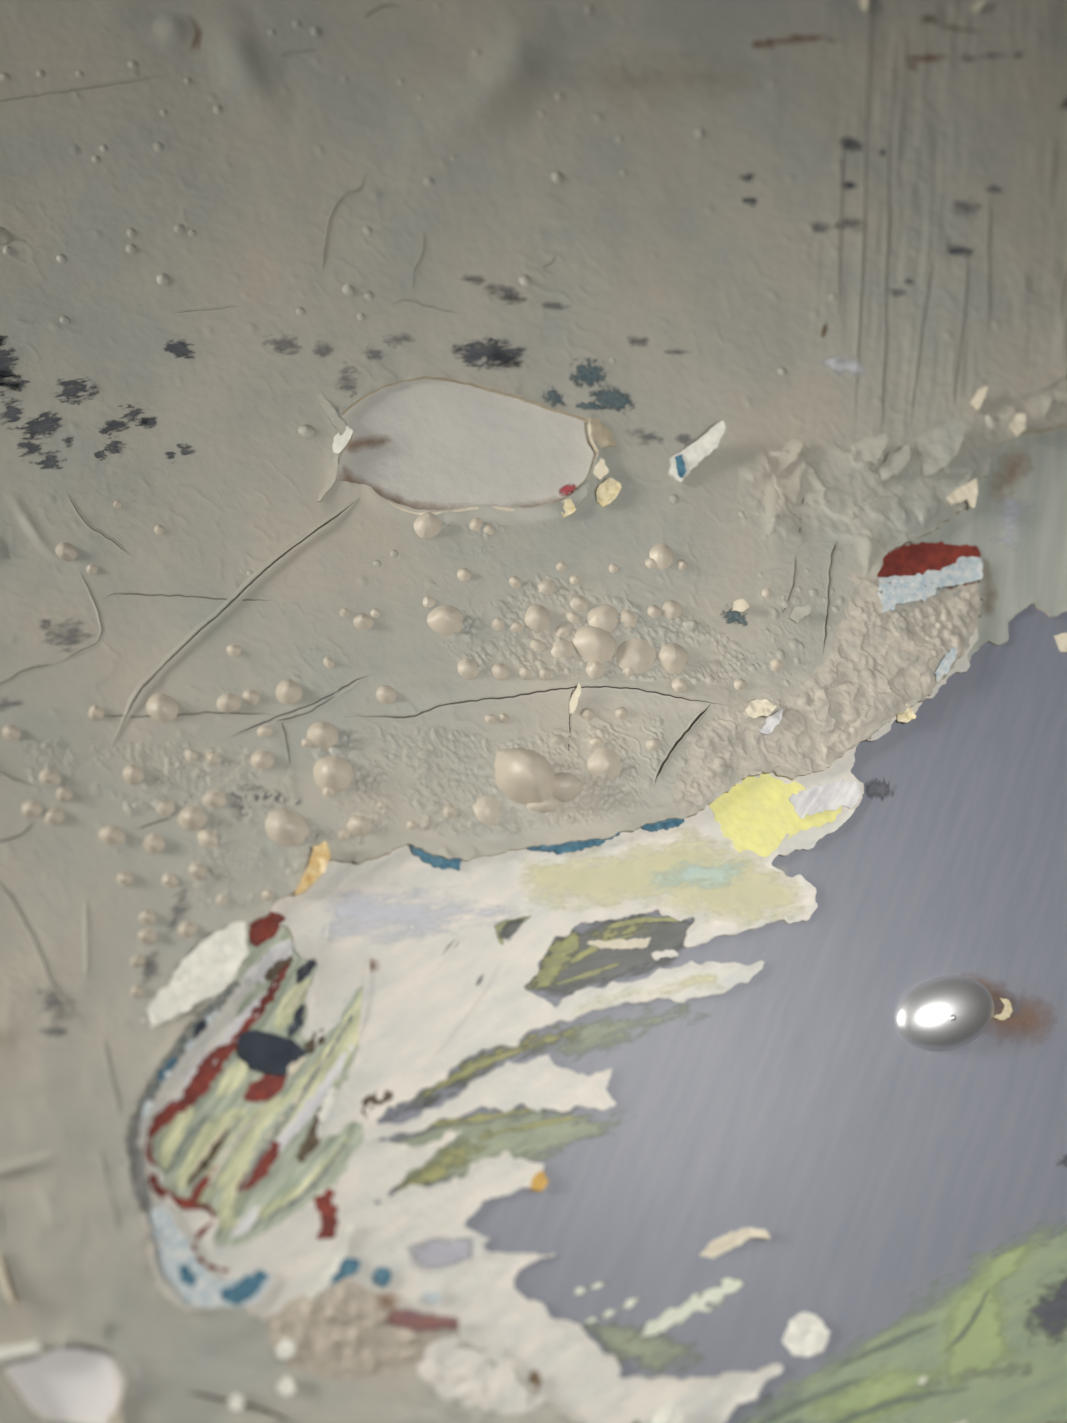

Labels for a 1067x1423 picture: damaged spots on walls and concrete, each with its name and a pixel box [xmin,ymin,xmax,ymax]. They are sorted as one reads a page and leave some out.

crack [0,491,730,788]
crack [0,822,36,844]
crack [0,882,122,1116]
crack [133,789,199,830]
peeling [120,377,1067,1423]
peeling [0,1321,126,1423]